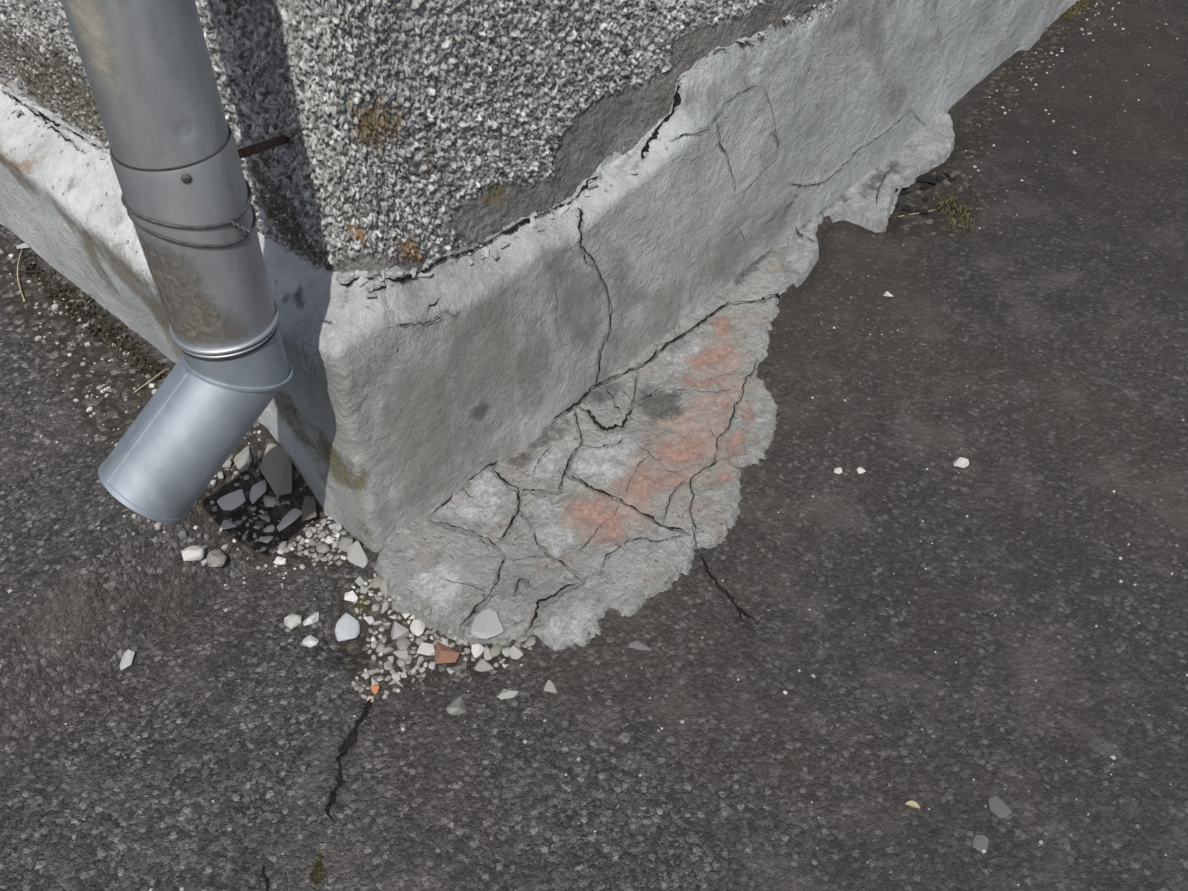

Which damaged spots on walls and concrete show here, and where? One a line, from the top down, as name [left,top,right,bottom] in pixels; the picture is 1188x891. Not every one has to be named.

spalling [527,0,823,231]
crack [641,80,780,191]
crack [739,110,925,242]
spalling [332,254,434,298]
peeling [456,227,519,265]
crack [337,176,786,636]
crack [324,693,372,822]
crack [261,861,269,891]